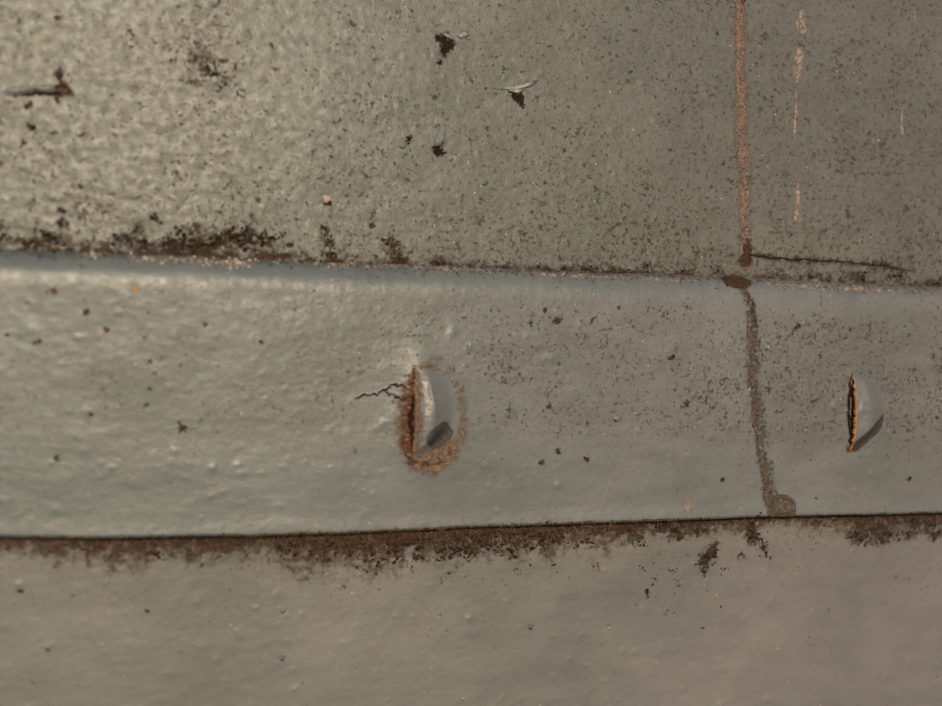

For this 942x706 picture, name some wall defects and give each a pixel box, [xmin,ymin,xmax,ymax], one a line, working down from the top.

peeling [435,30,470,65]
peeling [3,68,73,98]
peeling [500,79,538,108]
peeling [432,124,447,157]
corrosion [731,0,752,270]
crack [749,253,911,272]
crack [355,366,432,453]
corrosion [0,275,942,581]